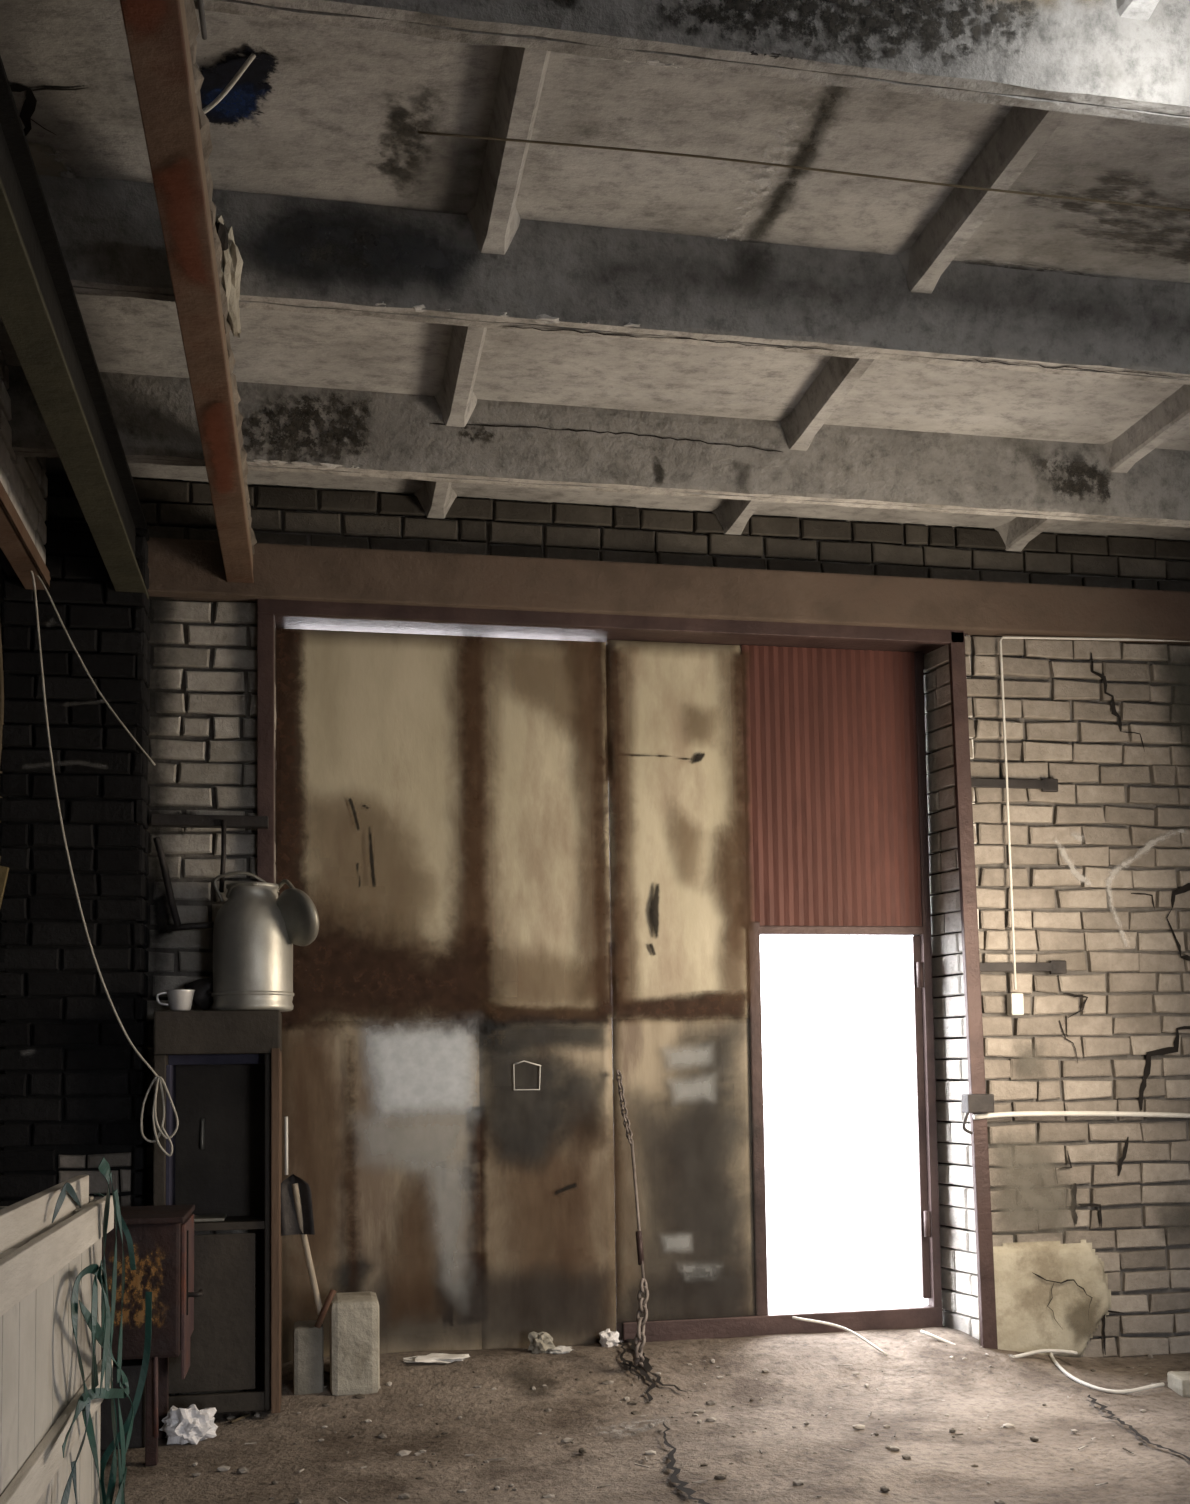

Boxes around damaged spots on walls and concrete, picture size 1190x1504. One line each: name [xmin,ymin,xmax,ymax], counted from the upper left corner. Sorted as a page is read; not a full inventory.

damp [658,0,1037,69]
damp [378,97,433,190]
damp [722,86,844,241]
damp [241,393,372,462]
damp [1037,453,1110,503]
crack [1091,653,1145,752]
crack [1131,883,1190,961]
rust [275,627,751,1316]
crack [1059,993,1088,1063]
crack [1055,1026,1190,1228]
crack [617,1338,710,1504]
crack [1087,1395,1190,1461]